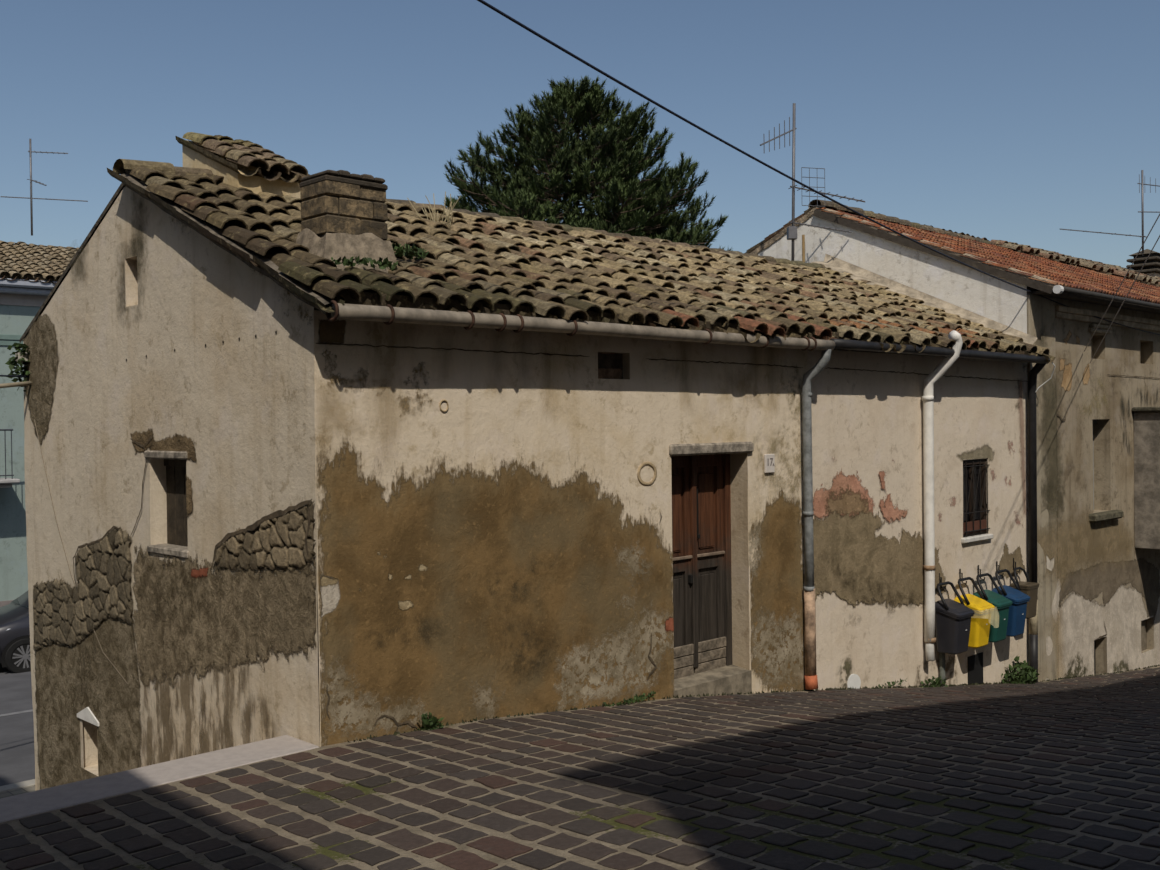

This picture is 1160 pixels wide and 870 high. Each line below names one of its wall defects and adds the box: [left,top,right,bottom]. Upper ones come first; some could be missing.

peeling [35,442,674,790]
peeling [750,458,948,692]
leakage [1065,655,1088,677]
leakage [1037,377,1132,582]
peeling [1059,558,1160,623]